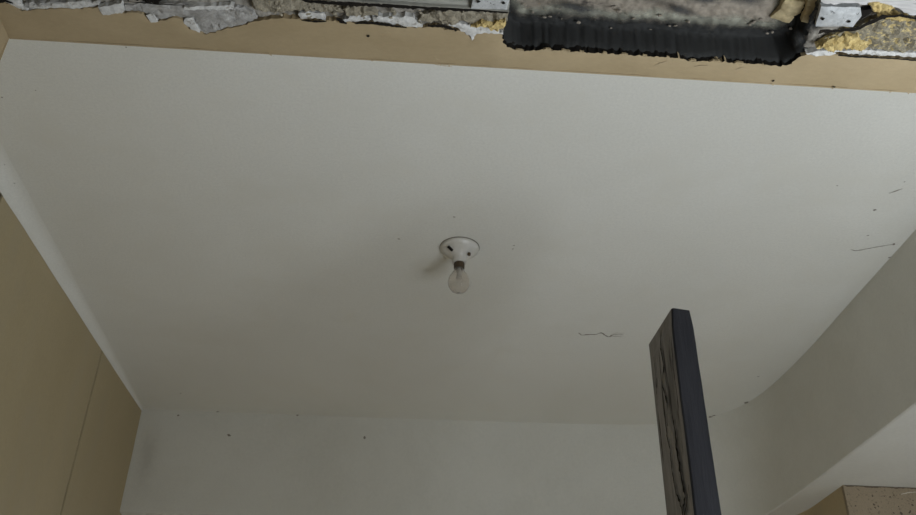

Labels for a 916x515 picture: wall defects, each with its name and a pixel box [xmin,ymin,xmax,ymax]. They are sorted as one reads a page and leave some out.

peeling [7,0,142,15]
spalling [167,0,780,40]
spalling [803,0,916,57]
crack [654,339,689,515]